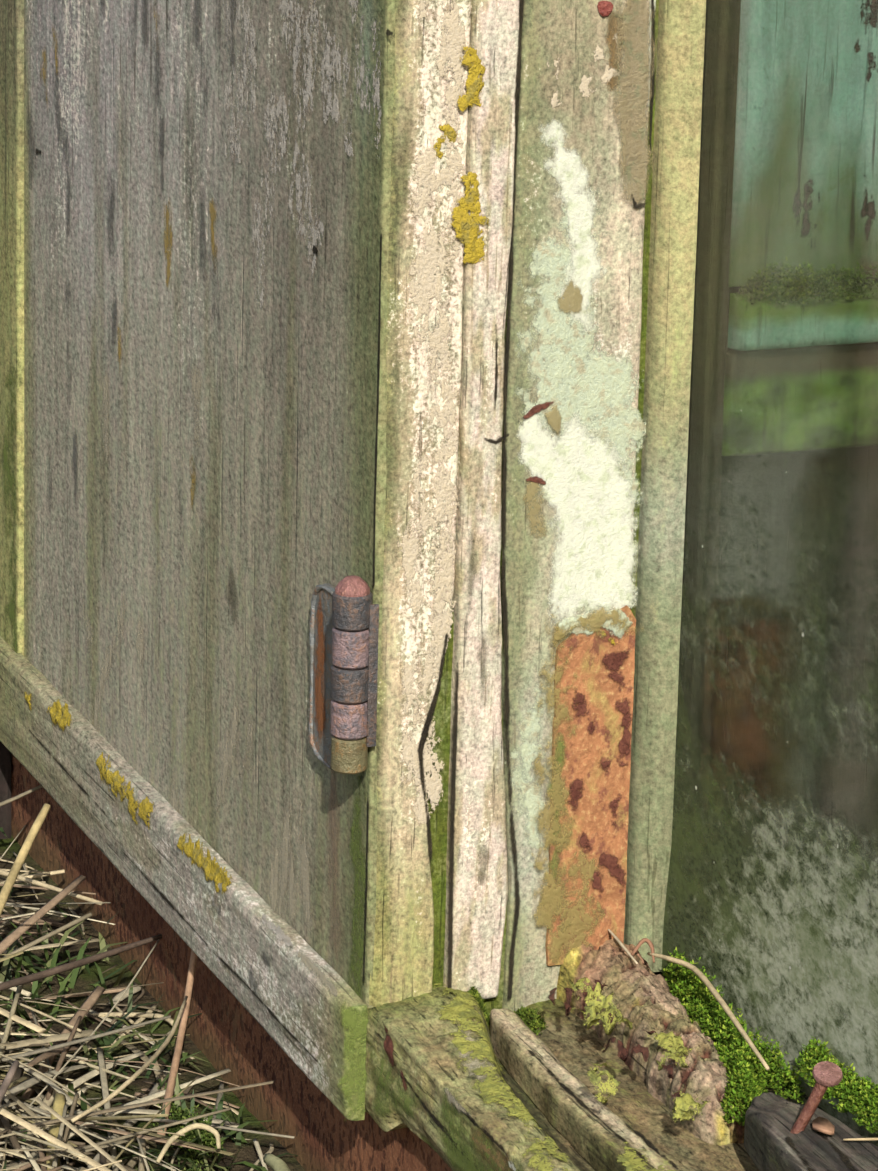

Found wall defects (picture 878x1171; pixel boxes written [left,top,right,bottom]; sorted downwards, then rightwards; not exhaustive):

peeling [579,45,621,97]
peeling [854,0,878,82]
peeling [860,175,876,240]
peeling [517,58,646,645]
corrosion [572,690,595,734]
corrosion [601,650,632,771]
crack [418,634,459,988]
corrosion [567,778,585,809]
corrosion [579,832,626,892]
crack [401,1074,519,1171]
crack [528,1050,683,1171]
crack [785,1123,857,1171]